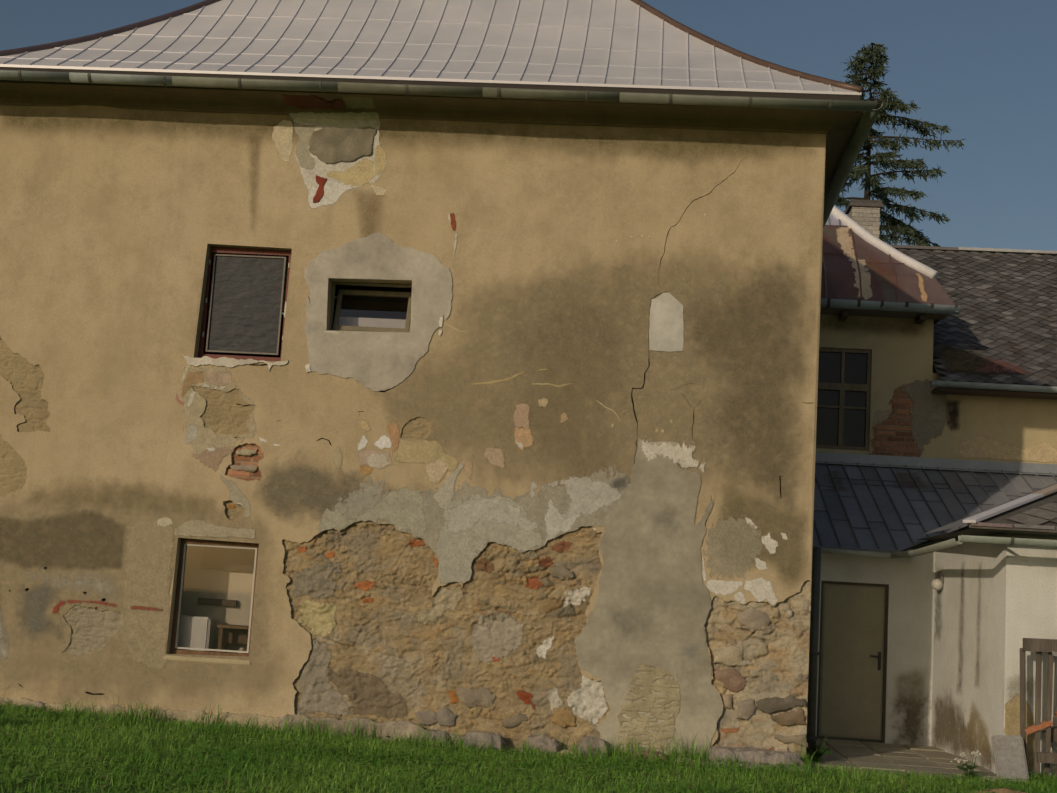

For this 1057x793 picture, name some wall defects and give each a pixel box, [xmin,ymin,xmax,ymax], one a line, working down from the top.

peeling [272,112,387,209]
flaking render [0,332,51,432]
leakage [0,499,247,692]
peeling [176,354,288,520]
leakage [263,467,363,515]
flaking render [0,417,631,751]
leakage [393,262,799,487]
crack [631,158,745,463]
flaking render [702,515,812,762]
leakage [722,495,801,579]
peeling [868,379,959,457]
leakage [899,674,991,768]